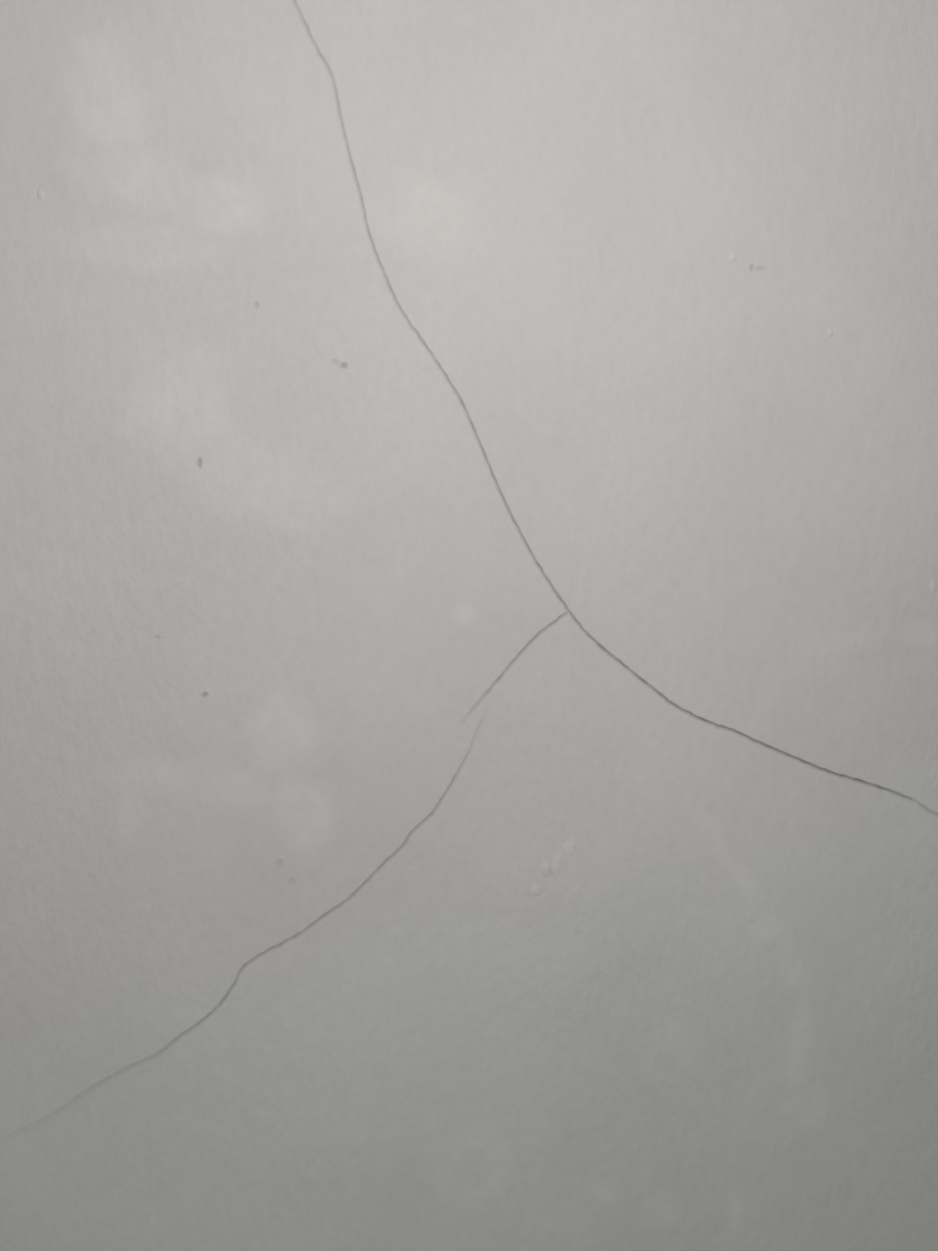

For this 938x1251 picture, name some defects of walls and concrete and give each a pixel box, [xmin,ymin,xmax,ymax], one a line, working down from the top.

crack [291,0,938,817]
crack [0,702,492,1144]